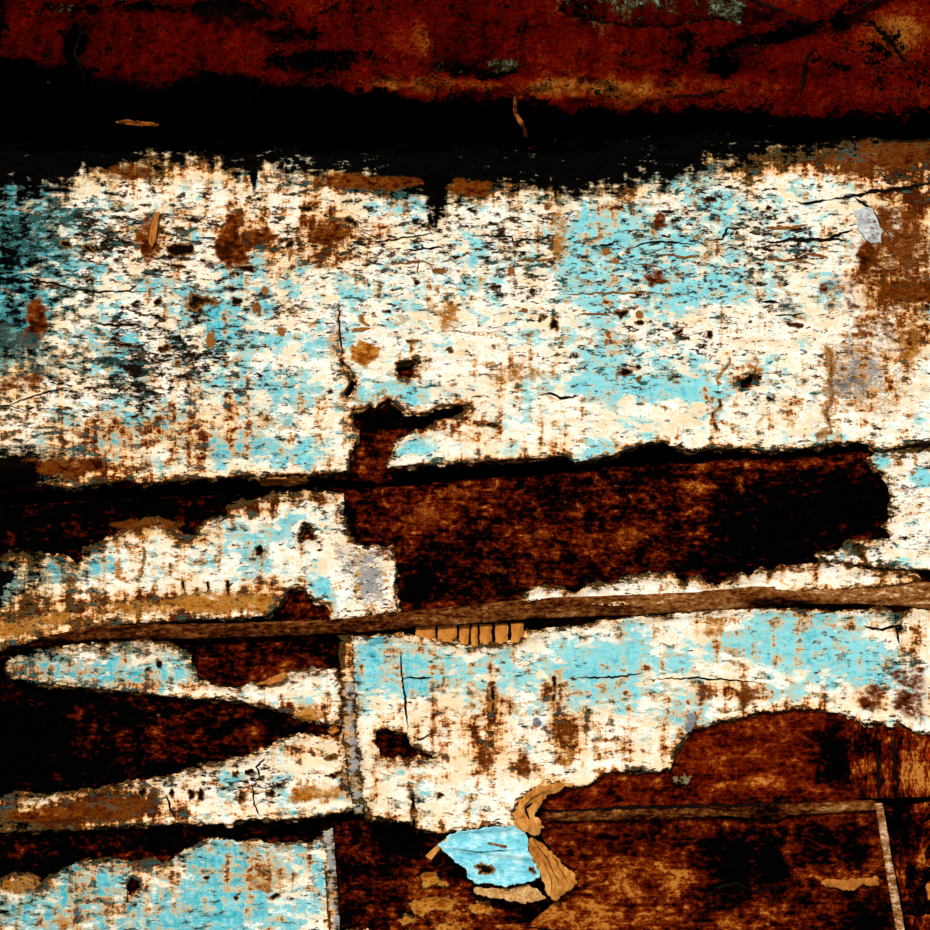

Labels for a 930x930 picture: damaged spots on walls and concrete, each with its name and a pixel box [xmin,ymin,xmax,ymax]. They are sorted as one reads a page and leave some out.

rust [0,0,930,181]
rust [214,205,279,269]
crack [595,182,930,269]
crack [336,302,344,356]
crack [562,291,667,315]
crack [762,300,802,316]
rust [819,203,930,373]
peeling [318,399,890,613]
peeling [173,633,343,688]
peeling [0,675,342,799]
rust [513,753,531,779]
peeling [0,708,861,930]